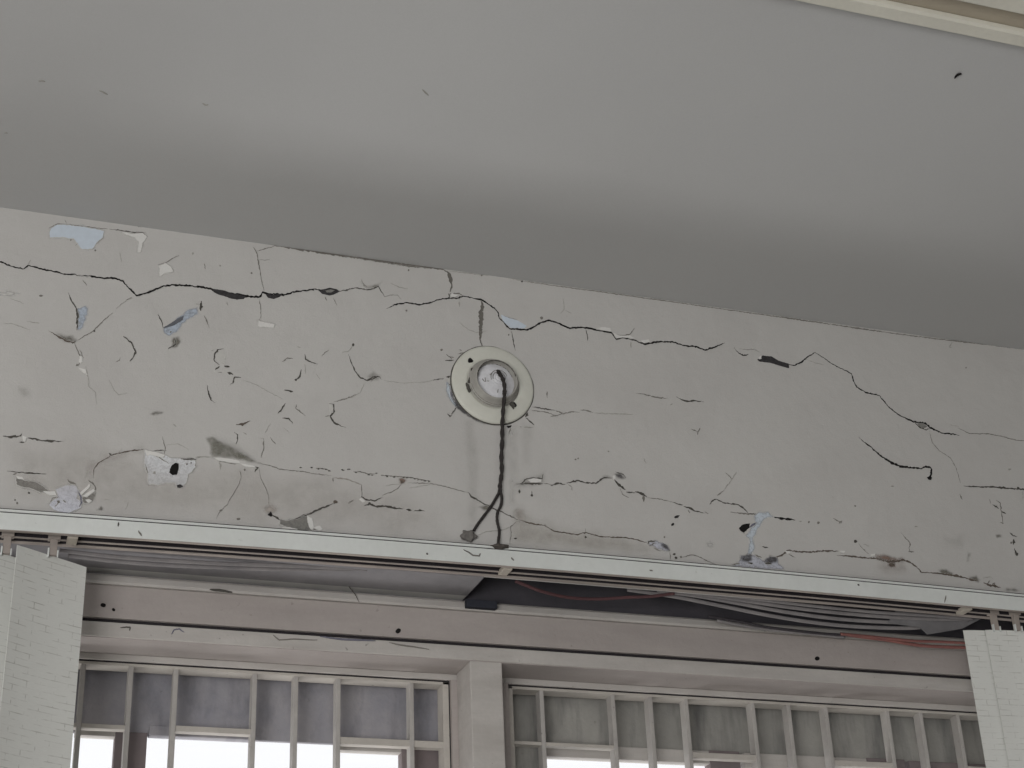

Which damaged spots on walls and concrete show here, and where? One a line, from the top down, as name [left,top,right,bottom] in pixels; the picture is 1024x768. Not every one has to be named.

peeling [48,220,148,253]
peeling [158,301,203,349]
crack [0,245,1024,588]
flaking render [143,436,201,488]
flaking render [15,476,97,513]
flaking render [731,512,782,569]